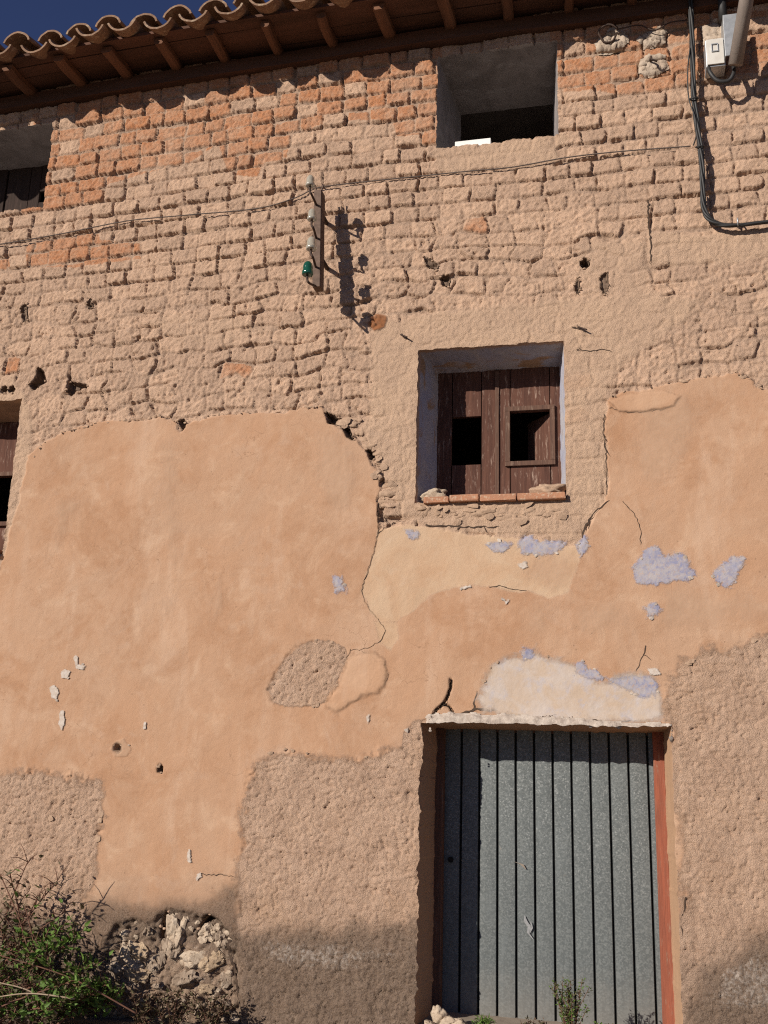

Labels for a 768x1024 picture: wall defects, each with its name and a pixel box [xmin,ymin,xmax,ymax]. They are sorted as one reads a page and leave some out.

spalling [422,255,450,288]
spalling [27,366,47,390]
flaking render [61,414,187,434]
flaking render [336,417,397,509]
crack [582,414,641,542]
flaking render [414,501,590,569]
crack [348,504,499,655]
peeling [632,545,695,586]
peeling [711,555,746,587]
crack [432,679,494,714]
spalling [0,633,768,1024]